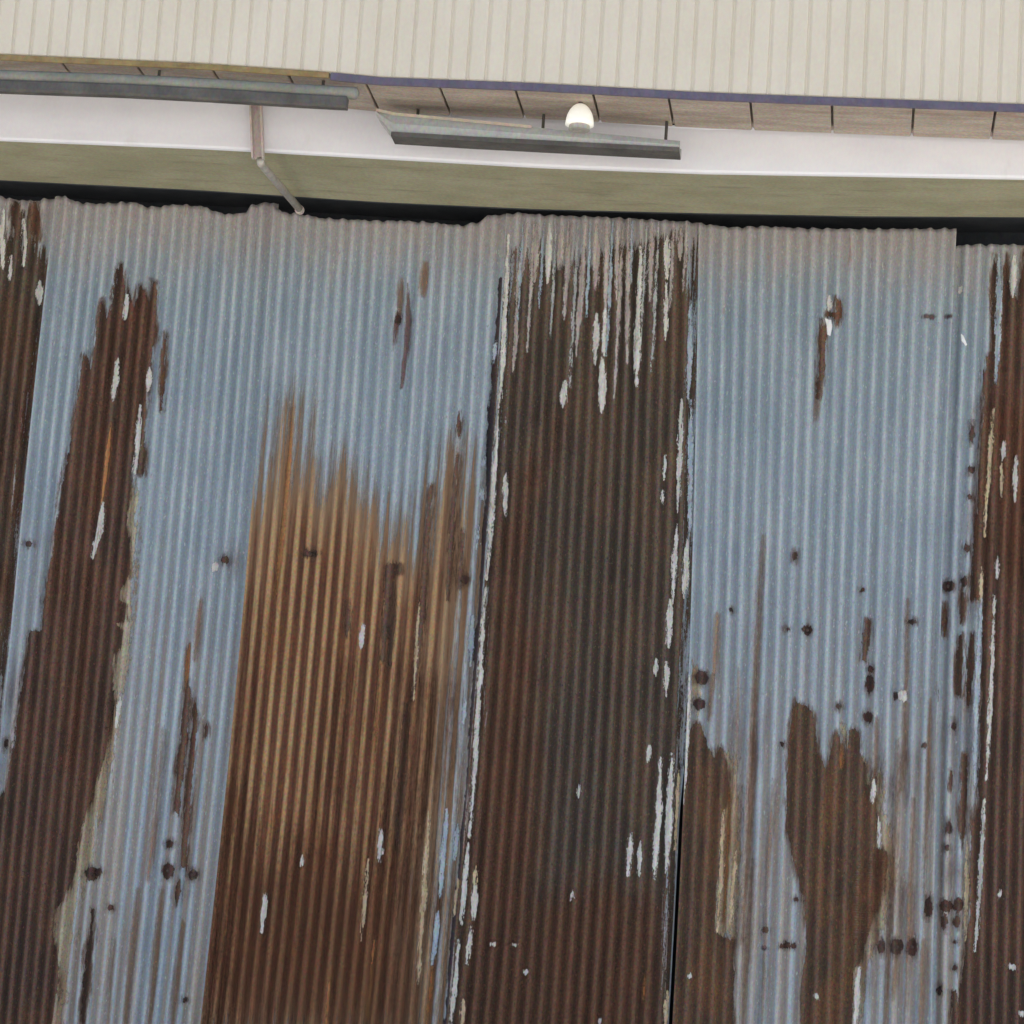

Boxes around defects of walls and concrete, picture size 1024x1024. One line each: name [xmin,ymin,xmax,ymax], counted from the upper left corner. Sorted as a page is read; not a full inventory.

rust [0,201,168,1024]
rust [172,922,188,1024]
rust [200,218,772,1024]
rust [779,250,1024,1024]